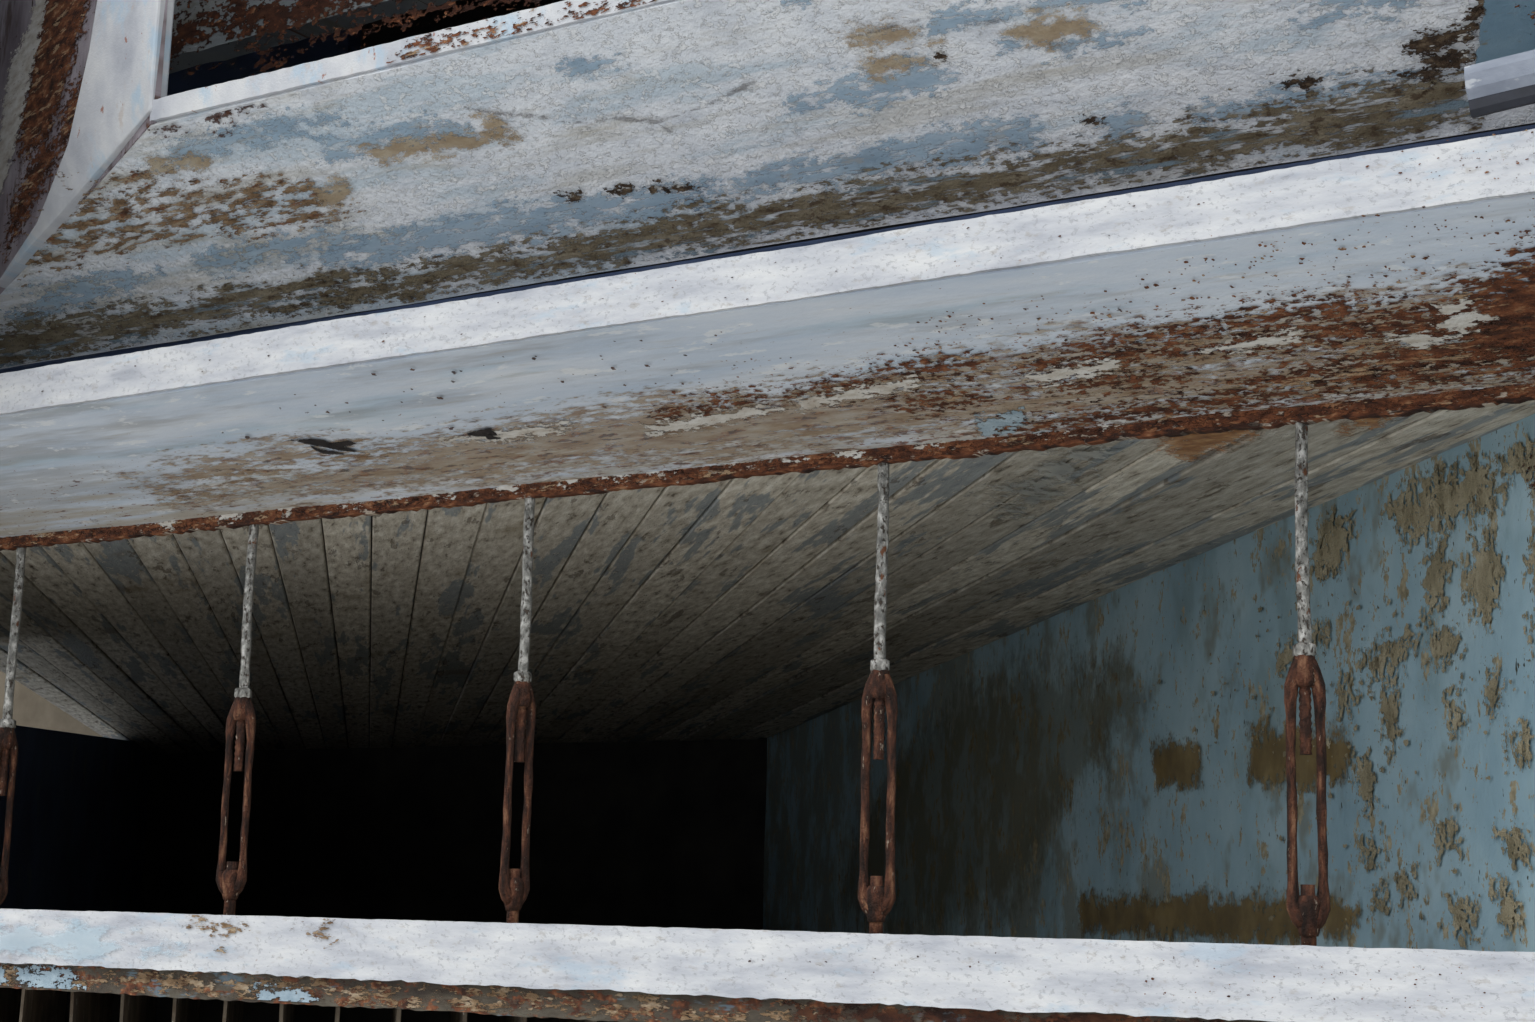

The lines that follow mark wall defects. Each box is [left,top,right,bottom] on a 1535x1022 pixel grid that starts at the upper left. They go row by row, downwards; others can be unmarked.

peeling [0,265,166,320]
rust [0,0,366,287]
rust [169,0,657,76]
rust [0,205,1535,547]
peeling [168,0,1535,318]
peeling [1255,433,1535,950]
rust [1,964,19,986]
rust [71,967,1237,1022]